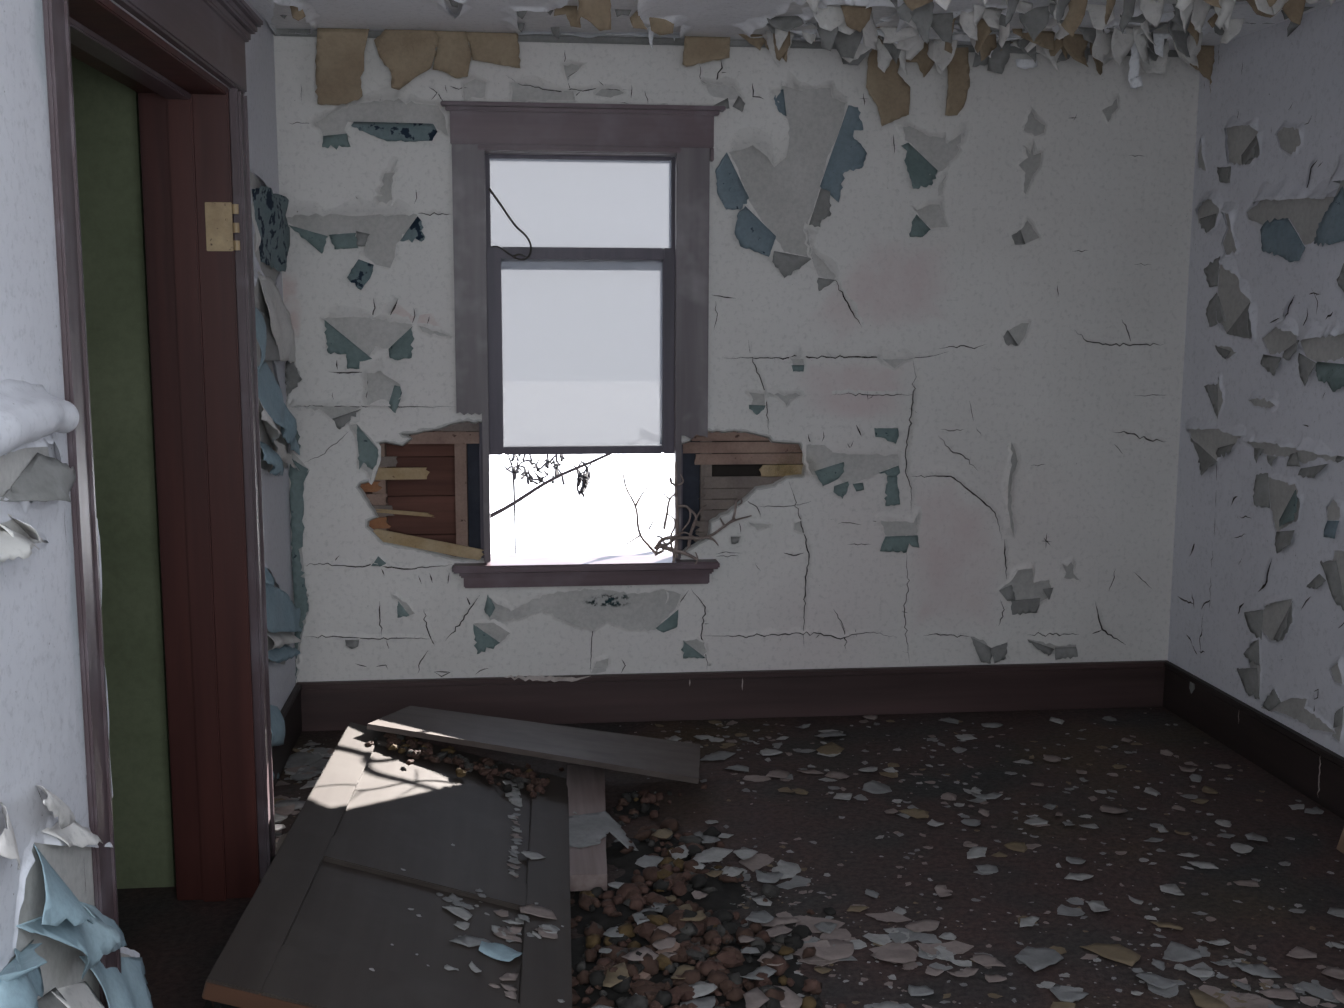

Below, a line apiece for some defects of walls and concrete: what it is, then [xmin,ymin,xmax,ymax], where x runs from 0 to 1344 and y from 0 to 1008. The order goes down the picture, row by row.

peeling [508,59,627,103]
peeling [499,0,694,50]
peeling [715,0,1336,291]
spalling [250,85,484,684]
peeling [1185,115,1344,553]
peeling [0,433,76,562]
peeling [471,584,710,660]
spalling [681,424,922,556]
crack [665,277,1272,666]
peeling [1237,592,1344,745]
peeling [1307,495,1344,611]
peeling [0,785,153,1008]